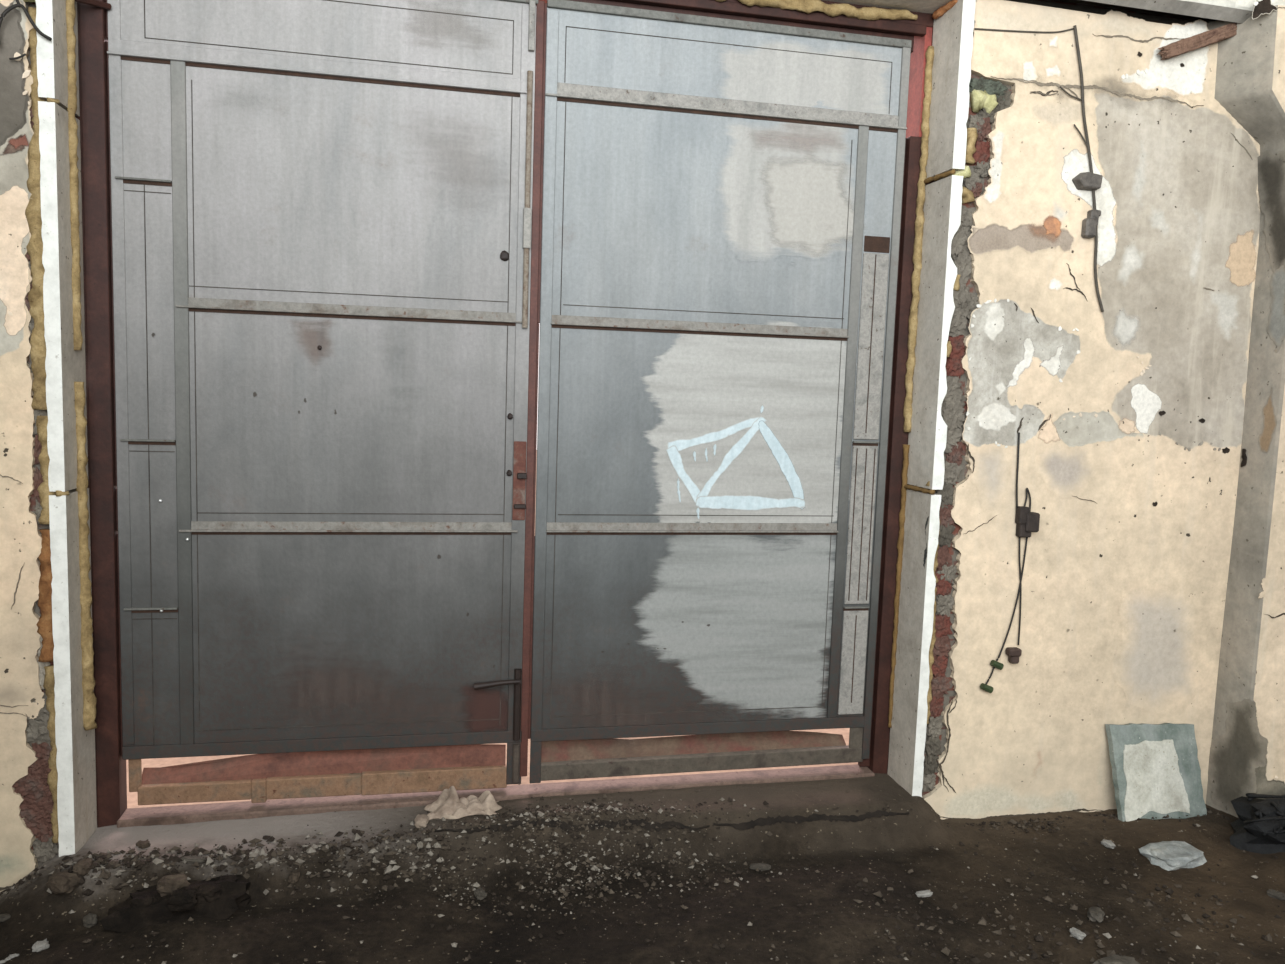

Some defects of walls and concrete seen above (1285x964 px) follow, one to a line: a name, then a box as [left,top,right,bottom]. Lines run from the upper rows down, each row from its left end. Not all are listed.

flaking render [0,0,34,199]
peeling [0,232,34,373]
flaking render [16,409,49,525]
peeling [922,77,1260,791]
flaking render [12,636,59,864]